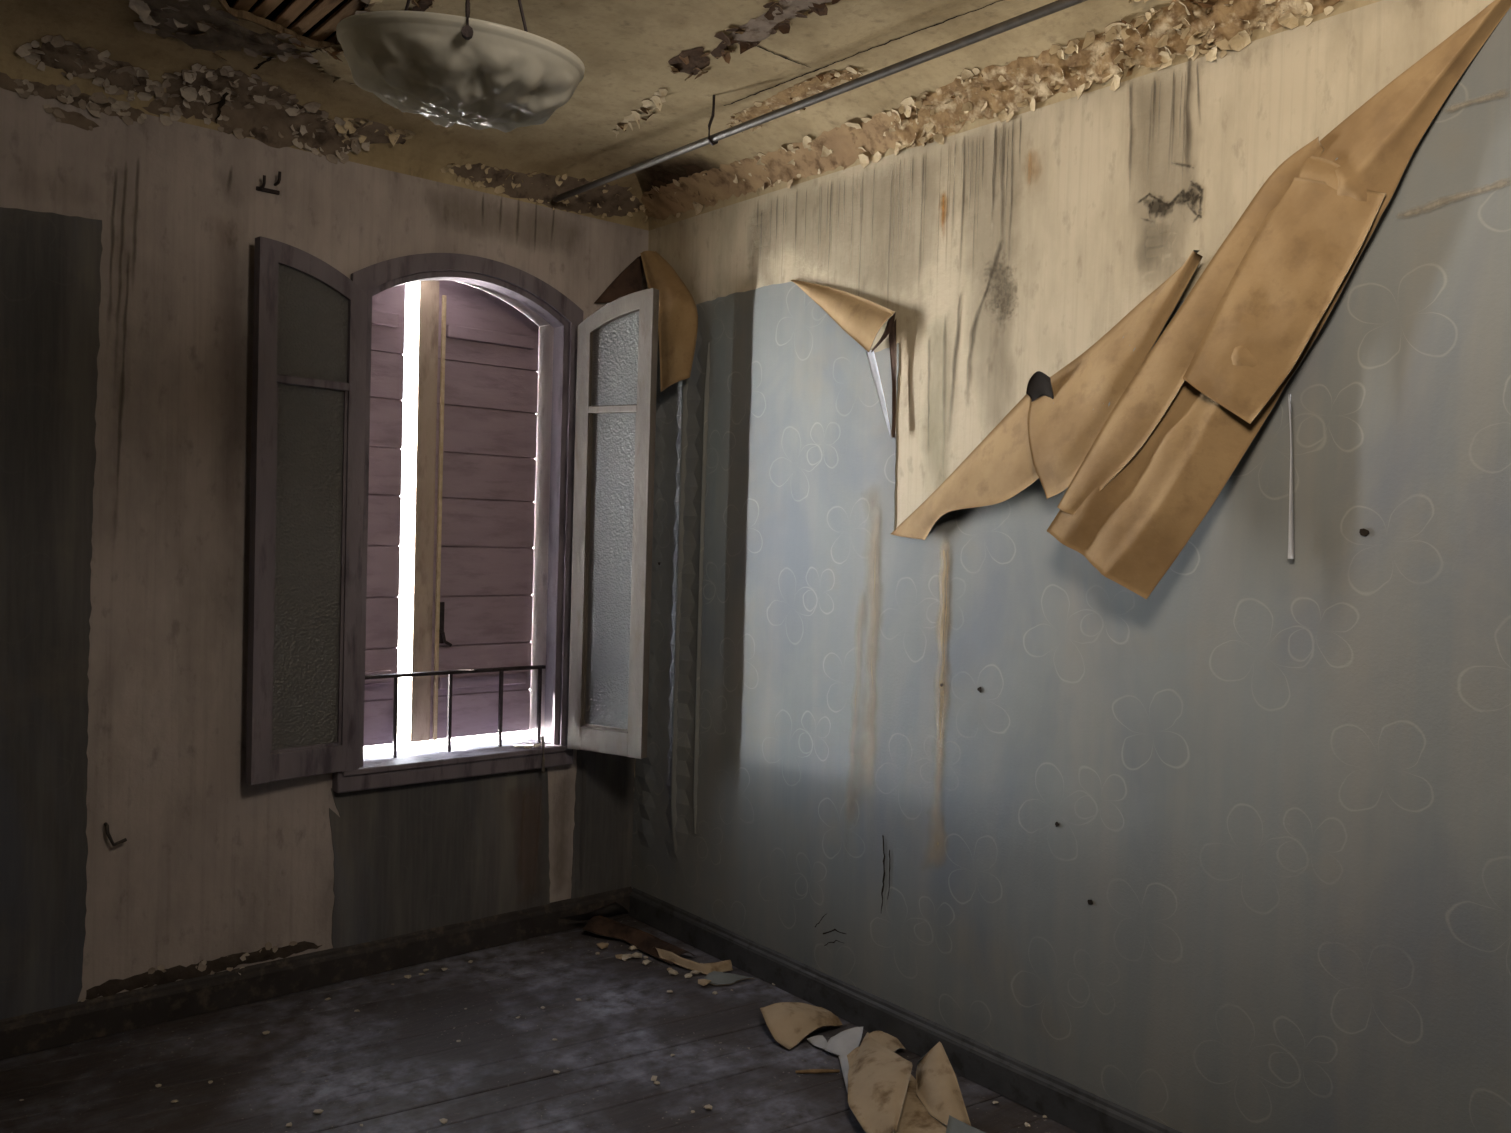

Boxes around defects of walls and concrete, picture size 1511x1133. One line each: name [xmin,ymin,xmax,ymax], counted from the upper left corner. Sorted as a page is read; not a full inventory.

peeling [0,0,415,164]
peeling [440,0,1342,222]
water stain [953,248,1000,379]
peeling [81,941,322,1002]